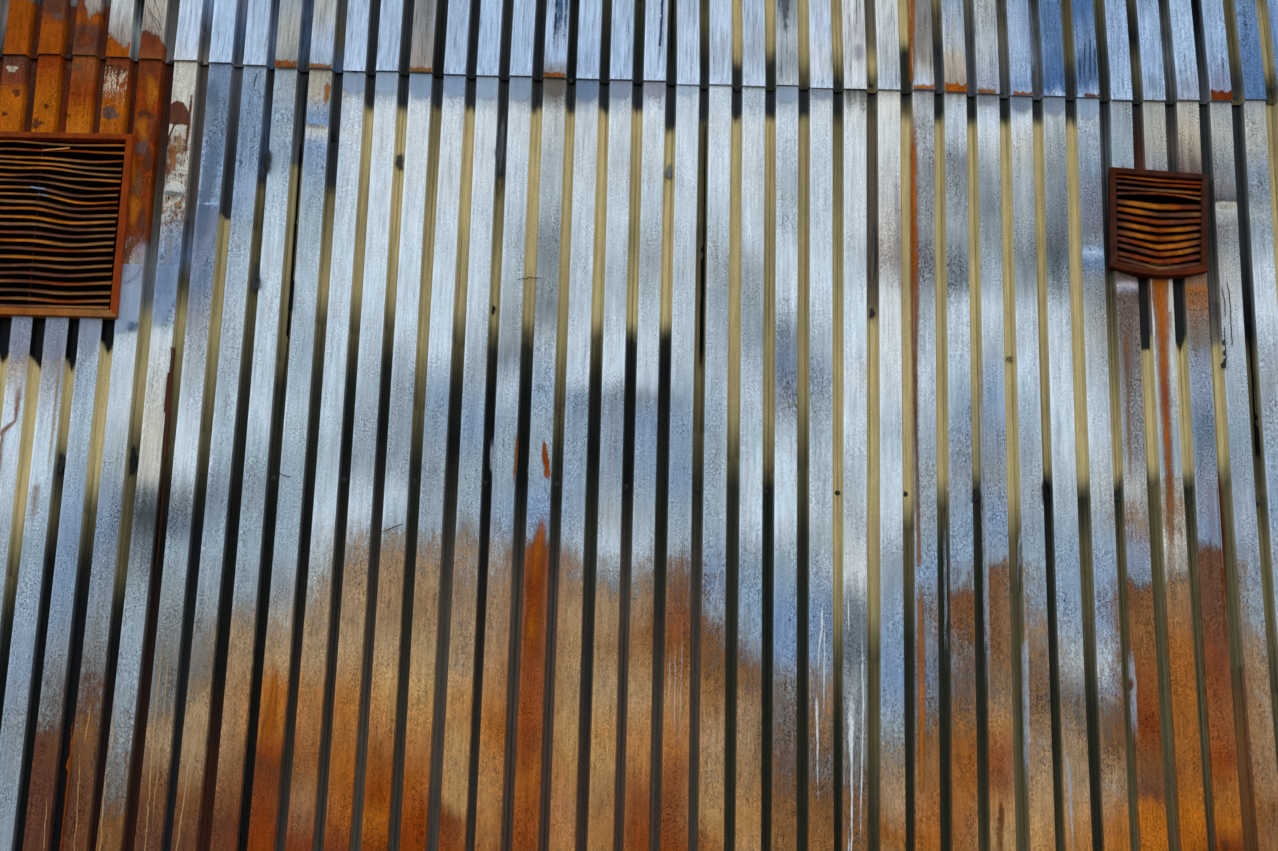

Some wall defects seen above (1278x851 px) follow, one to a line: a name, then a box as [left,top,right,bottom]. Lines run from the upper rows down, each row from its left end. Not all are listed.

rust [0,0,167,243]
rust [23,279,1278,851]
rust [910,120,921,567]
rust [907,0,996,93]